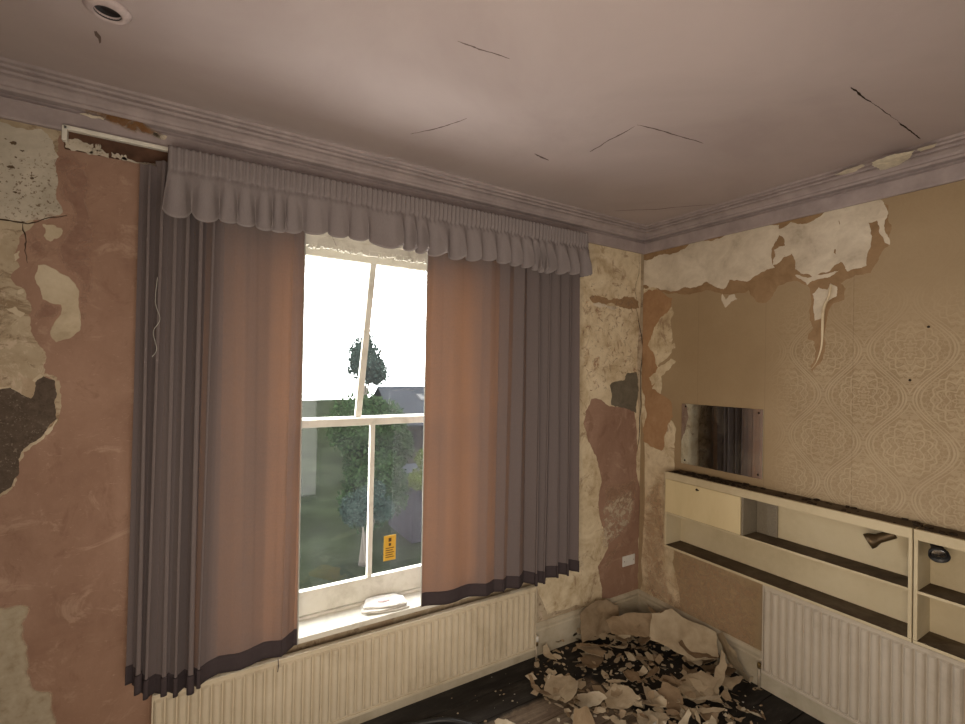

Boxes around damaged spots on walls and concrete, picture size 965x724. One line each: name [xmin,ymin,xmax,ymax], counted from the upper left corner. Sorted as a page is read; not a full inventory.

crack [458,41,509,59]
crack [590,125,702,152]
crack [851,87,921,139]
crack [0,215,67,263]
flaking render [0,122,156,724]
peeling [537,200,892,614]